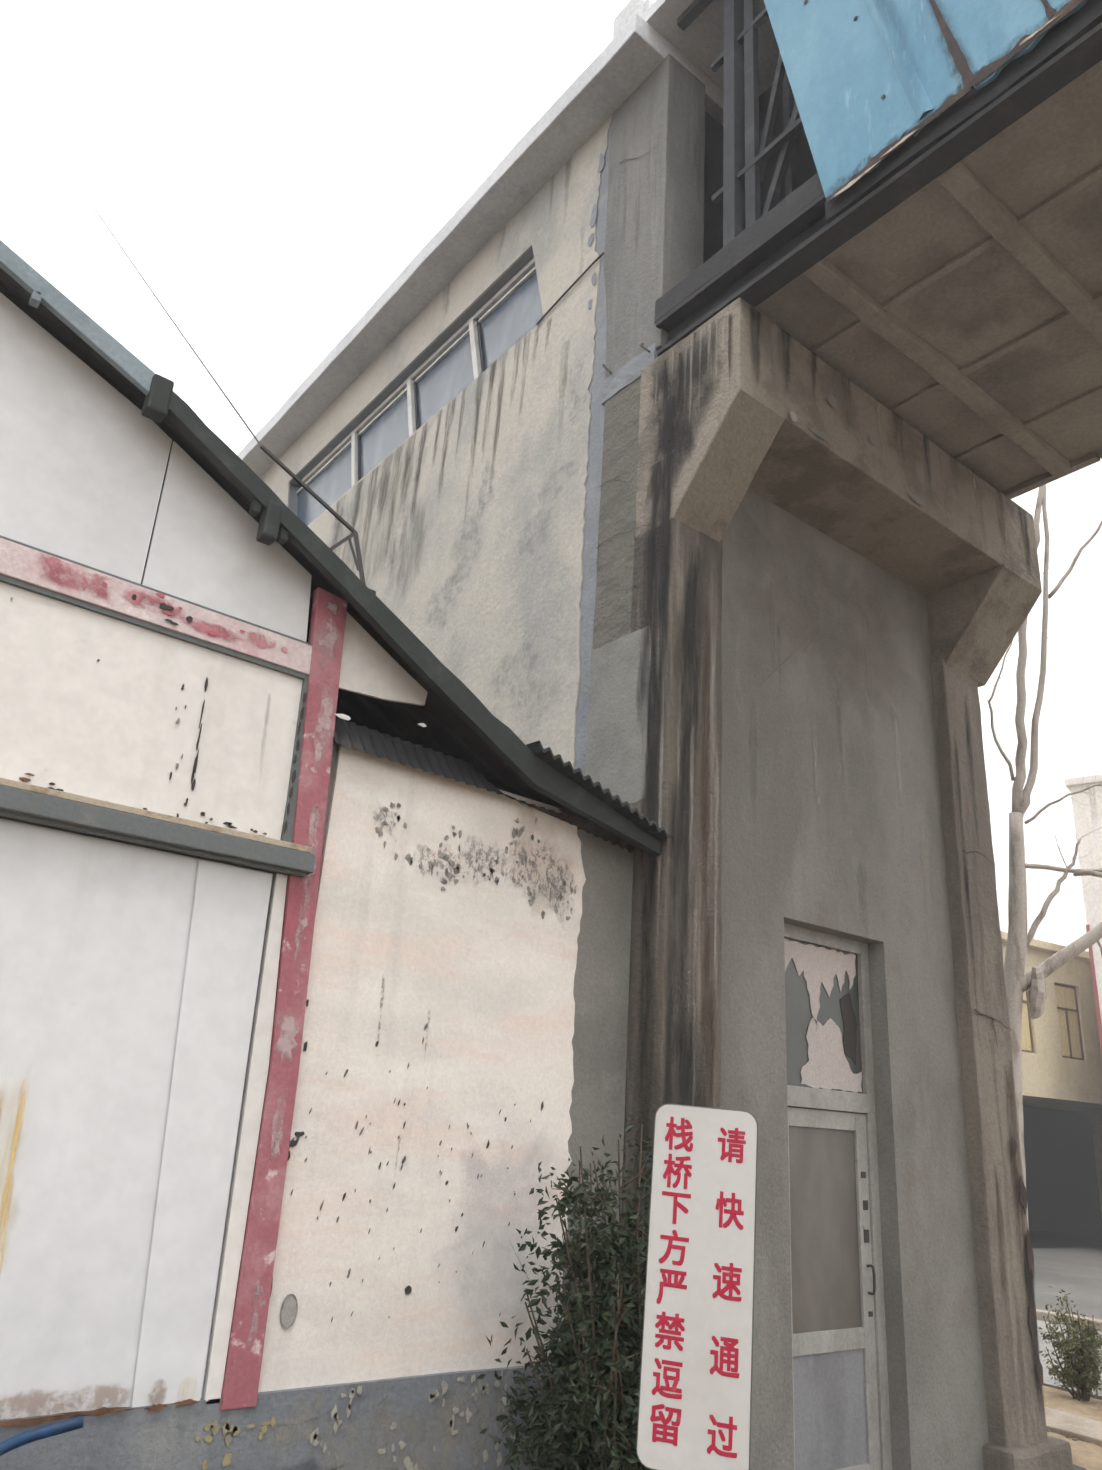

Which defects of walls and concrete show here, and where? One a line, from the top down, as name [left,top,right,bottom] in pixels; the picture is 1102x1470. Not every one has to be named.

rust [826,0,1085,203]
leakage [337,361,503,522]
leakage [998,490,1030,558]
peeling [126,591,288,652]
peeling [169,678,208,804]
peeling [283,693,333,833]
leakage [641,314,732,1106]
rust [9,1098,24,1174]
peeling [272,1113,307,1162]
peeling [277,1000,309,1056]
flaking render [374,802,634,1337]
leakage [640,853,655,1135]